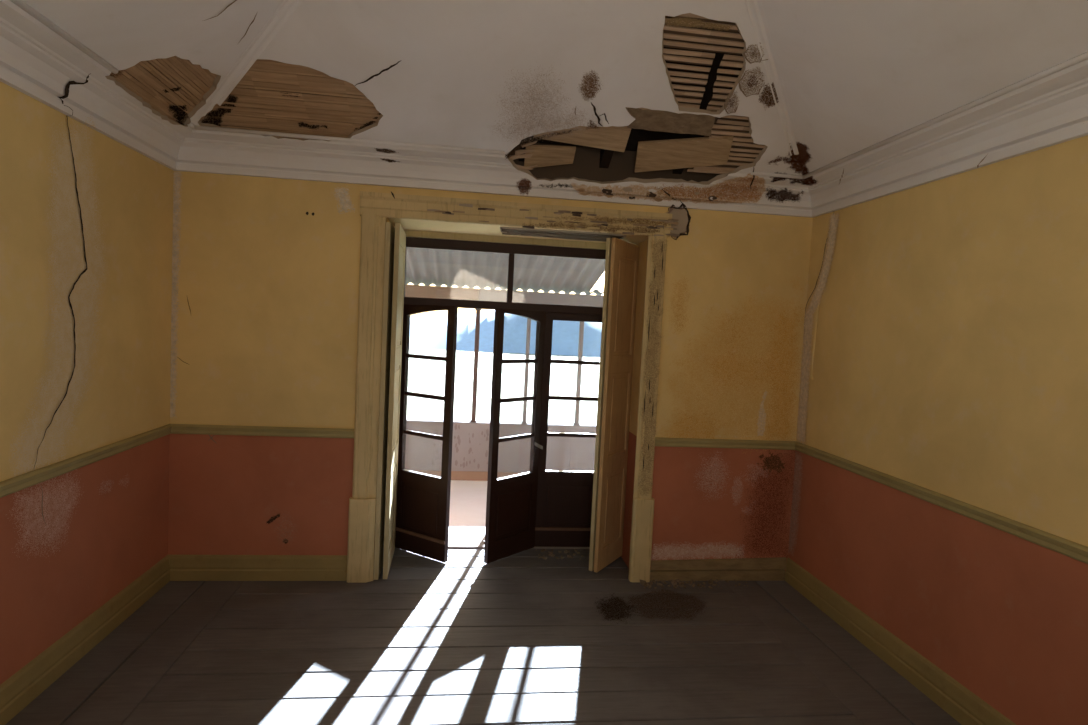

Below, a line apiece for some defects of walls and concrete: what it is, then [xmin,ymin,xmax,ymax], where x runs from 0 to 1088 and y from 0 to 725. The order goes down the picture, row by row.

crack [207,0,257,42]
flaking render [105,56,383,141]
crack [355,61,400,86]
crack [34,73,91,524]
flaking render [427,13,767,496]
damp [651,275,807,560]